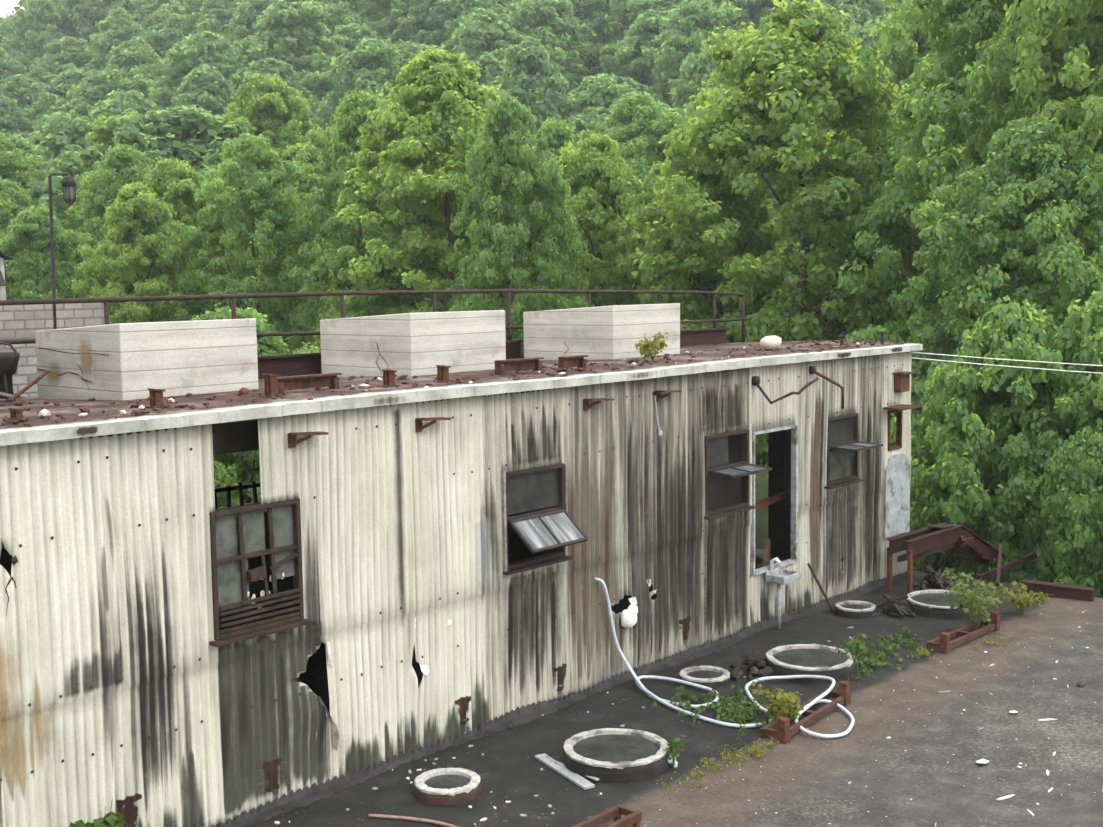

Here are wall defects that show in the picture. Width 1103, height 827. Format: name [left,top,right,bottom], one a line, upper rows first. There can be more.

damp [100,508,113,737]
damp [481,492,499,587]
damp [508,427,748,692]
damp [760,589,768,621]
damp [785,585,810,615]
damp [823,397,881,591]
corrosion [0,662,43,820]
corrosion [116,794,142,827]
damp [119,554,186,811]
damp [183,714,201,827]
corrosion [455,696,471,731]